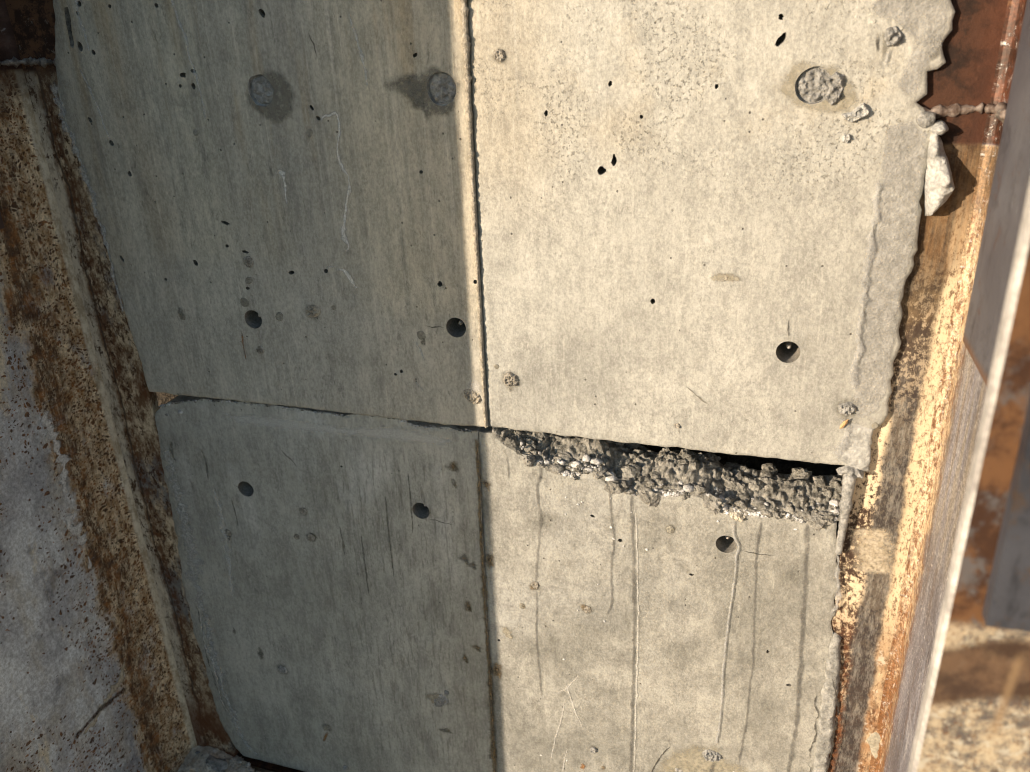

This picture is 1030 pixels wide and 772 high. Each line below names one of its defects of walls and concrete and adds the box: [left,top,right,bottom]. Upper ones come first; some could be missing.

spalling [876,26,902,61]
peeling [824,72,870,123]
leakage [536,462,593,504]
leakage [653,489,690,500]
rust [460,554,493,570]
leakage [722,507,808,598]
leakage [624,488,639,771]
leakage [788,580,807,772]